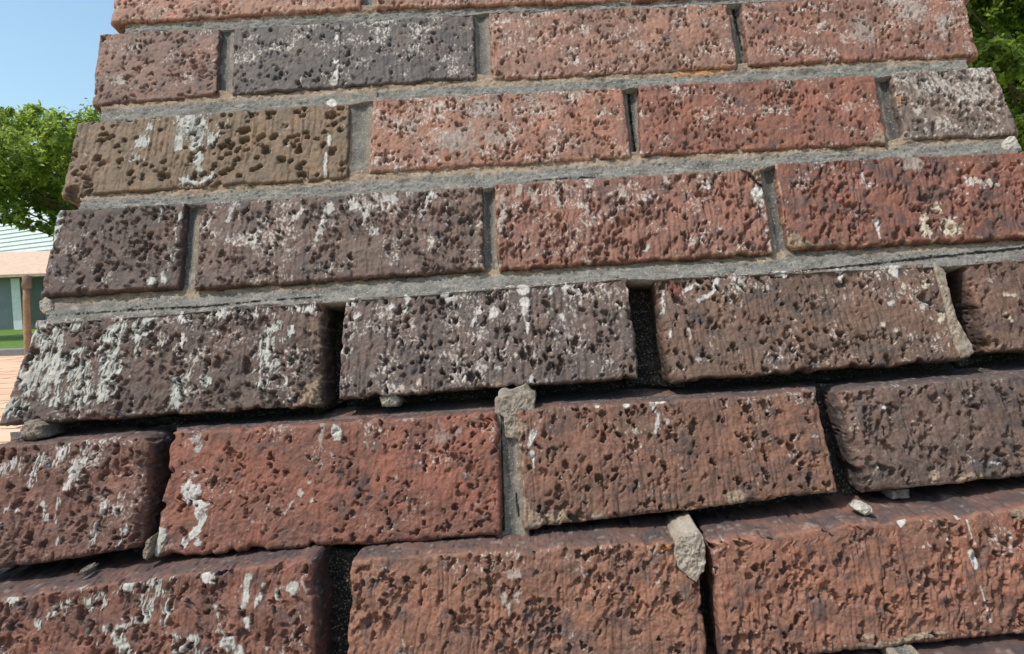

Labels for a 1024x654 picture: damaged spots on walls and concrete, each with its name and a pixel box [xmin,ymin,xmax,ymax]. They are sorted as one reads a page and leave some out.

spalling [523,468,572,530]